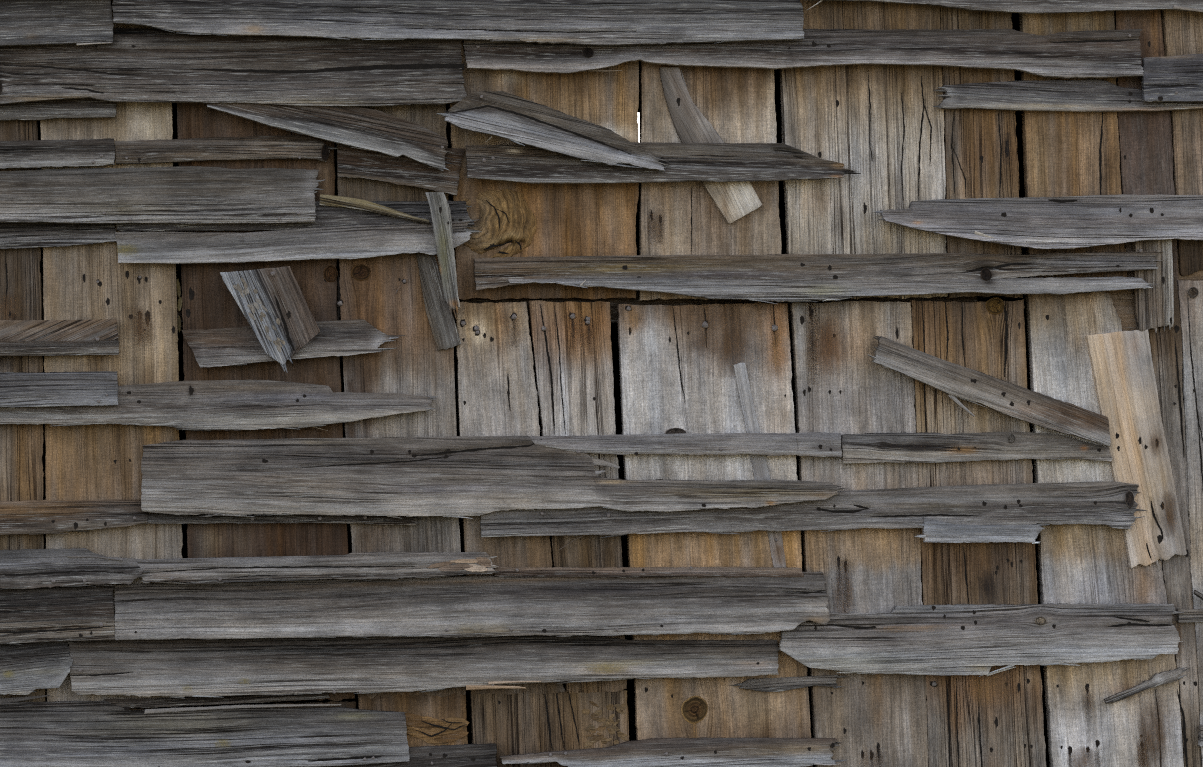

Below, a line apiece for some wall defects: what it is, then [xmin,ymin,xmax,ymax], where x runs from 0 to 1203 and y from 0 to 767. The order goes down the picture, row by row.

crack [866,74,874,157]
crack [901,76,966,201]
crack [1175,304,1203,490]